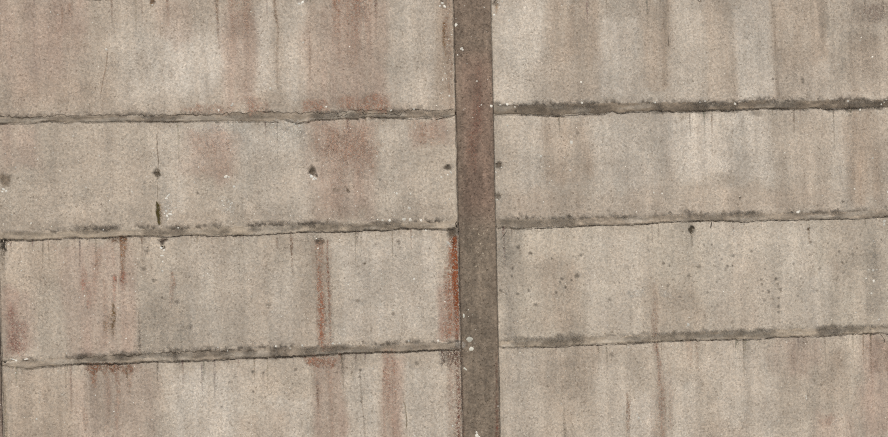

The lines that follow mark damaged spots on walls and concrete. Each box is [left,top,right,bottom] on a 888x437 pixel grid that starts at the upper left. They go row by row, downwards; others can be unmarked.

crack [0,201,458,242]
rust [441,236,459,338]